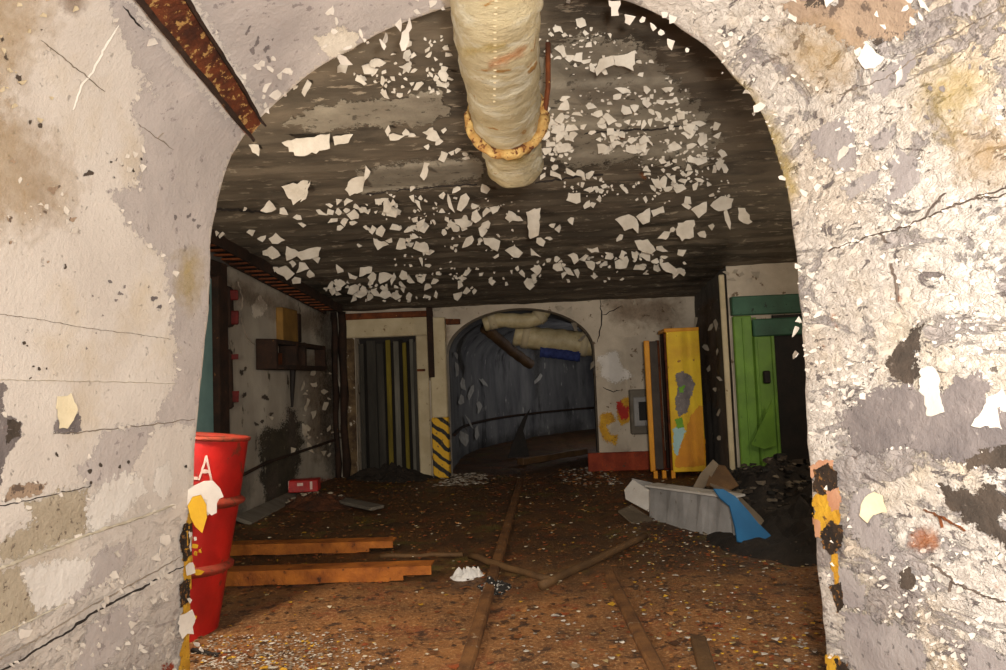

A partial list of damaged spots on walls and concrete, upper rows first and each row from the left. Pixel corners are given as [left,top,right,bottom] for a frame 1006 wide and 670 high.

peeling [781,0,930,98]
peeling [194,0,760,317]
crack [828,185,1006,302]
peeling [0,0,260,639]
peeling [792,242,1006,670]
crack [0,557,184,670]
peeling [170,598,204,652]